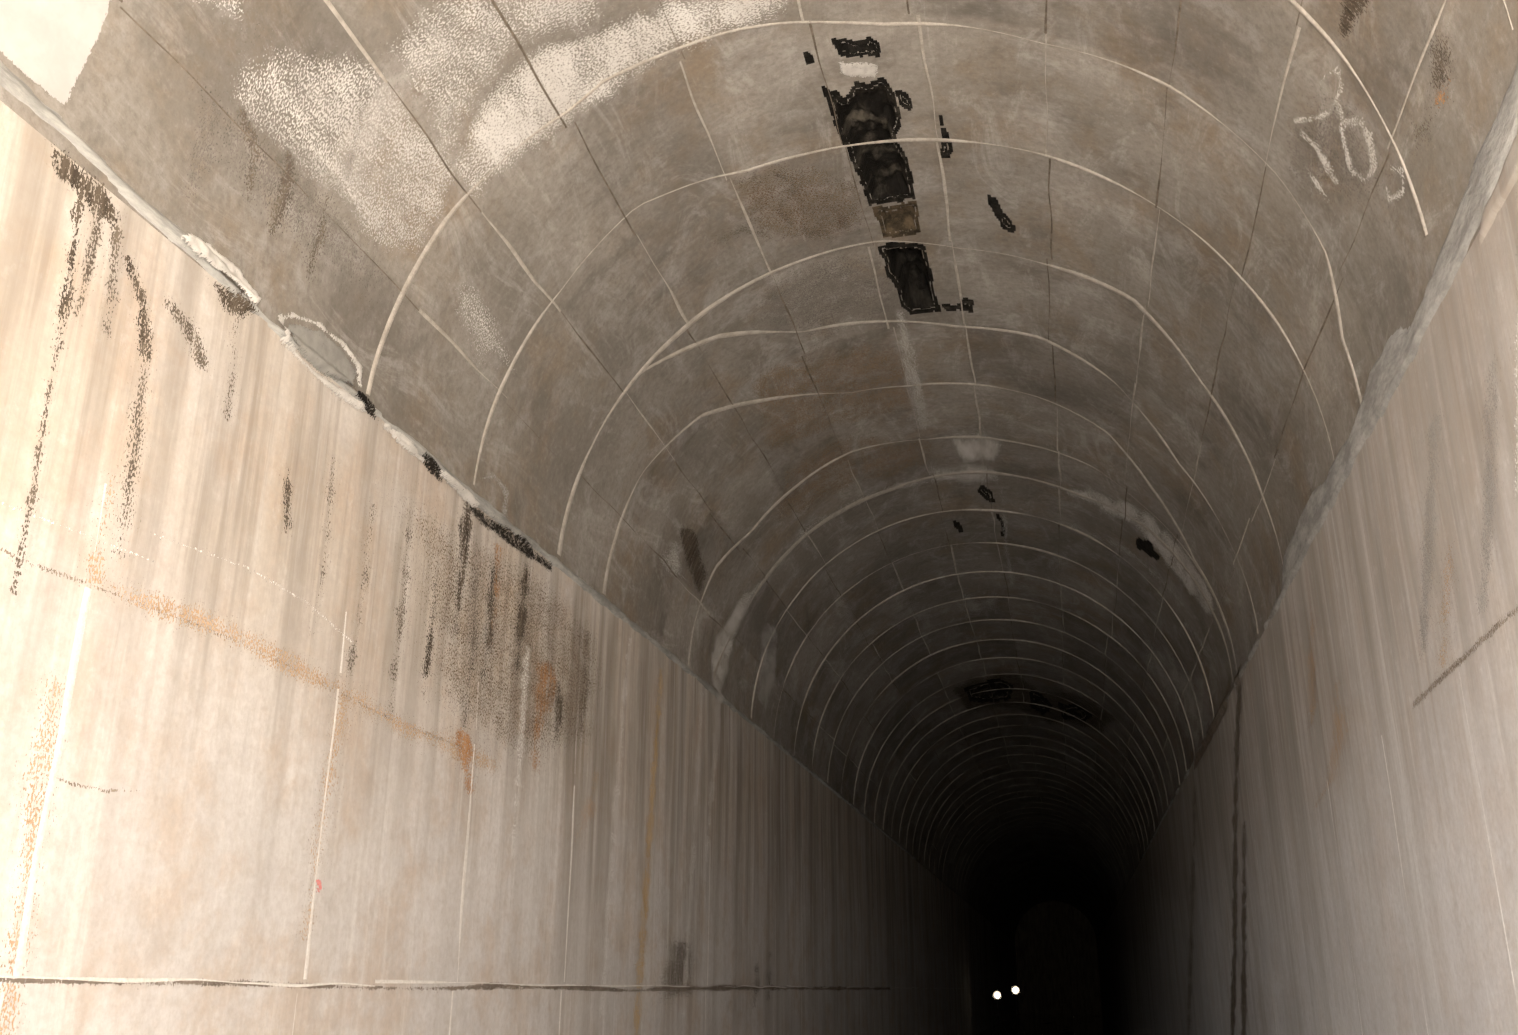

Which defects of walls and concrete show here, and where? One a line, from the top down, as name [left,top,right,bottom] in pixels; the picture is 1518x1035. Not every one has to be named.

spalling [803,51,815,65]
spalling [821,36,974,315]
spalling [987,194,1016,233]
leakage [10,144,209,595]
leakage [213,281,259,421]
leakage [449,278,516,372]
leakage [283,468,293,533]
leakage [318,457,336,596]
leakage [345,493,632,1015]